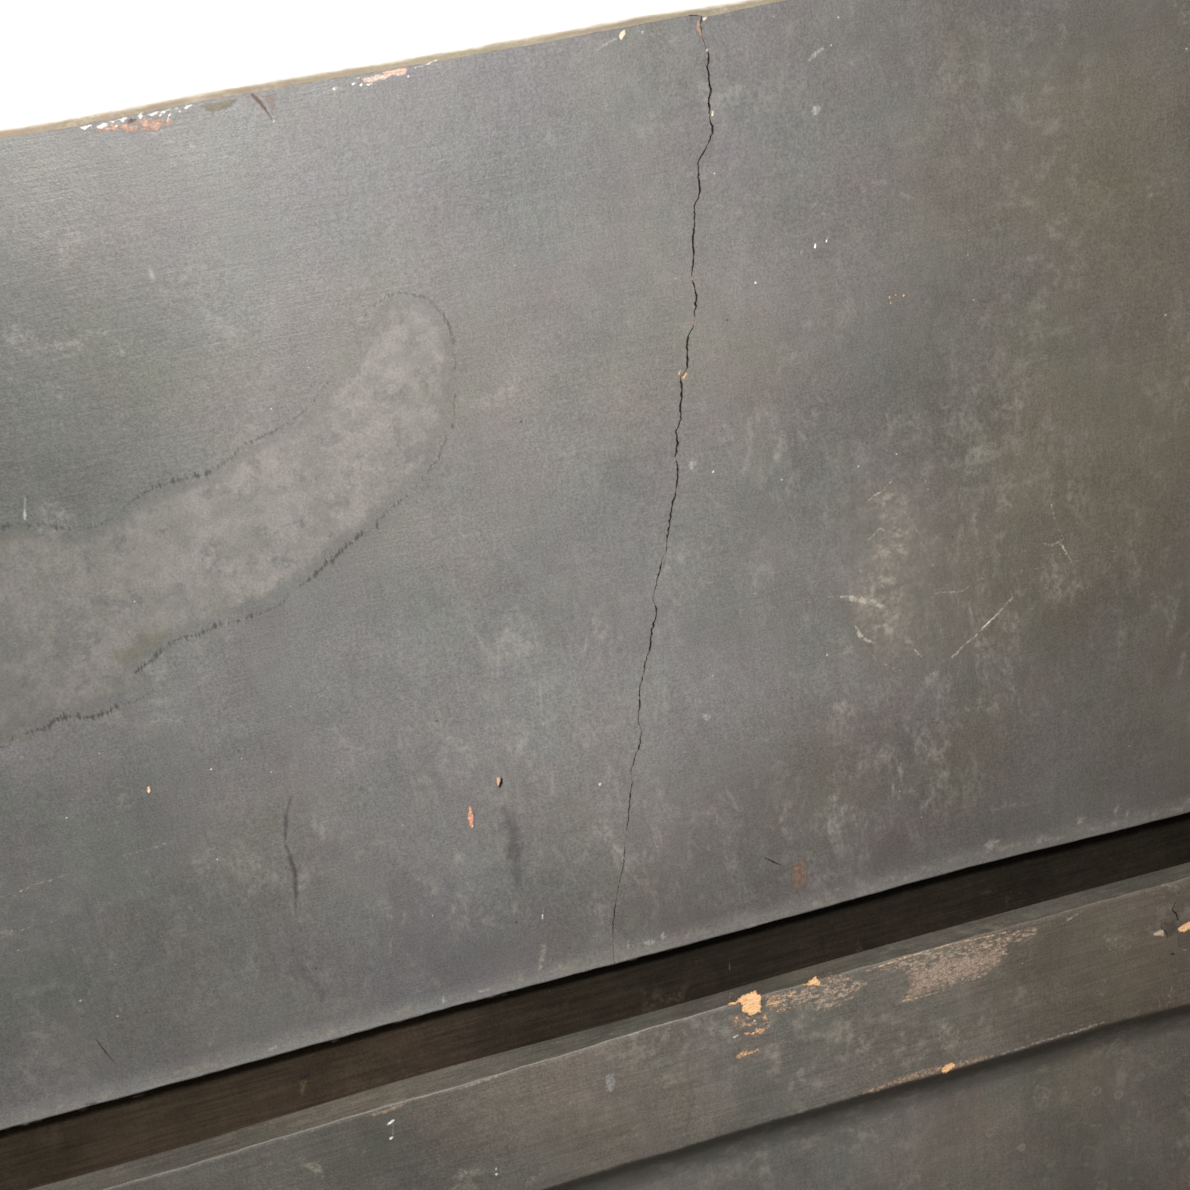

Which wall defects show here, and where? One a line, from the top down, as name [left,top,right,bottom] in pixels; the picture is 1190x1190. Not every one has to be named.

peeling [352,60,437,86]
peeling [80,99,236,134]
water stain [0,295,450,739]
crack [612,16,714,961]
peeling [1154,906,1190,959]
peeling [727,974,866,1059]